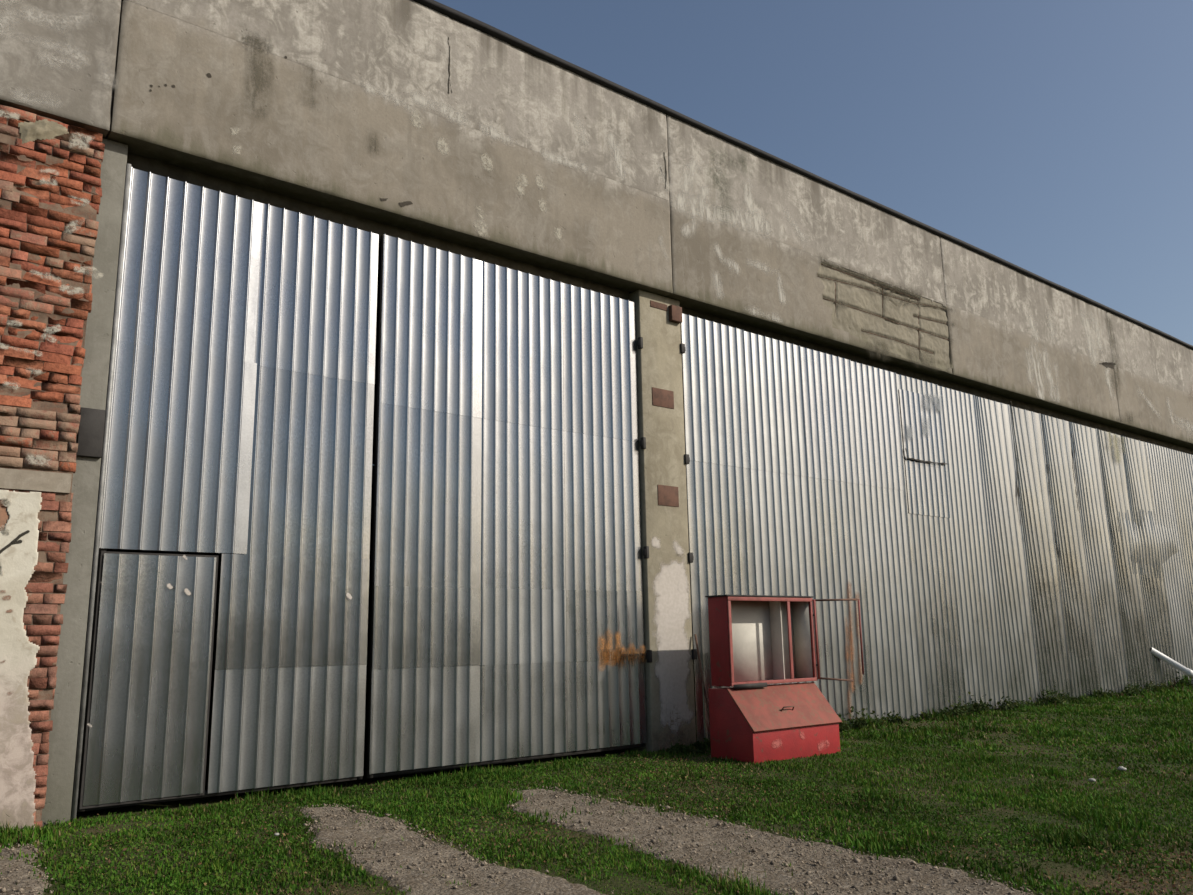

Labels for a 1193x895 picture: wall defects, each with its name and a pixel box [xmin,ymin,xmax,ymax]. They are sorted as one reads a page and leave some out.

crack [446,37,454,94]
spalling [817,261,954,372]
flaking render [0,499,12,534]